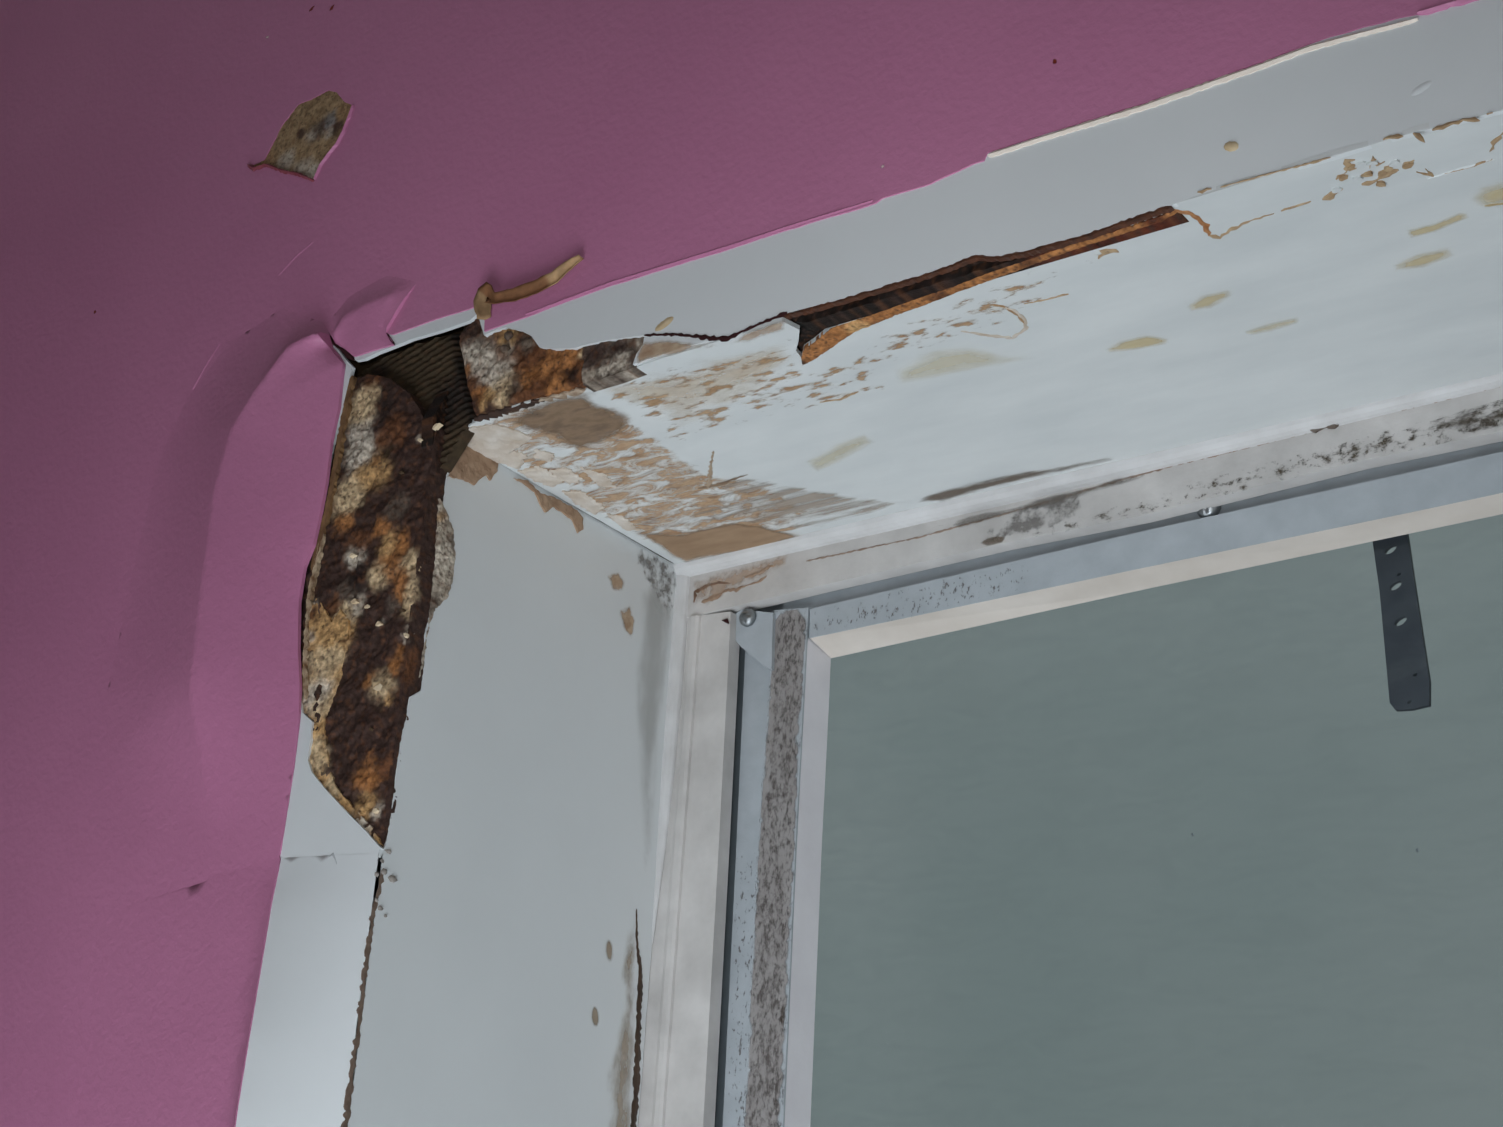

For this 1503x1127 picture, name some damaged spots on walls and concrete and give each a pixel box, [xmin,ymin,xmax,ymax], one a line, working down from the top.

peeling [247,90,354,182]
spalling [581,337,647,392]
rust [612,282,1069,437]
flaking render [403,498,456,677]
peeling [447,424,640,533]
leakage [495,398,884,607]
leakage [925,467,1069,500]
leakage [956,478,1132,545]
flaking render [302,598,384,846]
mould [729,569,1022,1127]
crack [340,849,398,1127]
crack [630,909,643,1127]